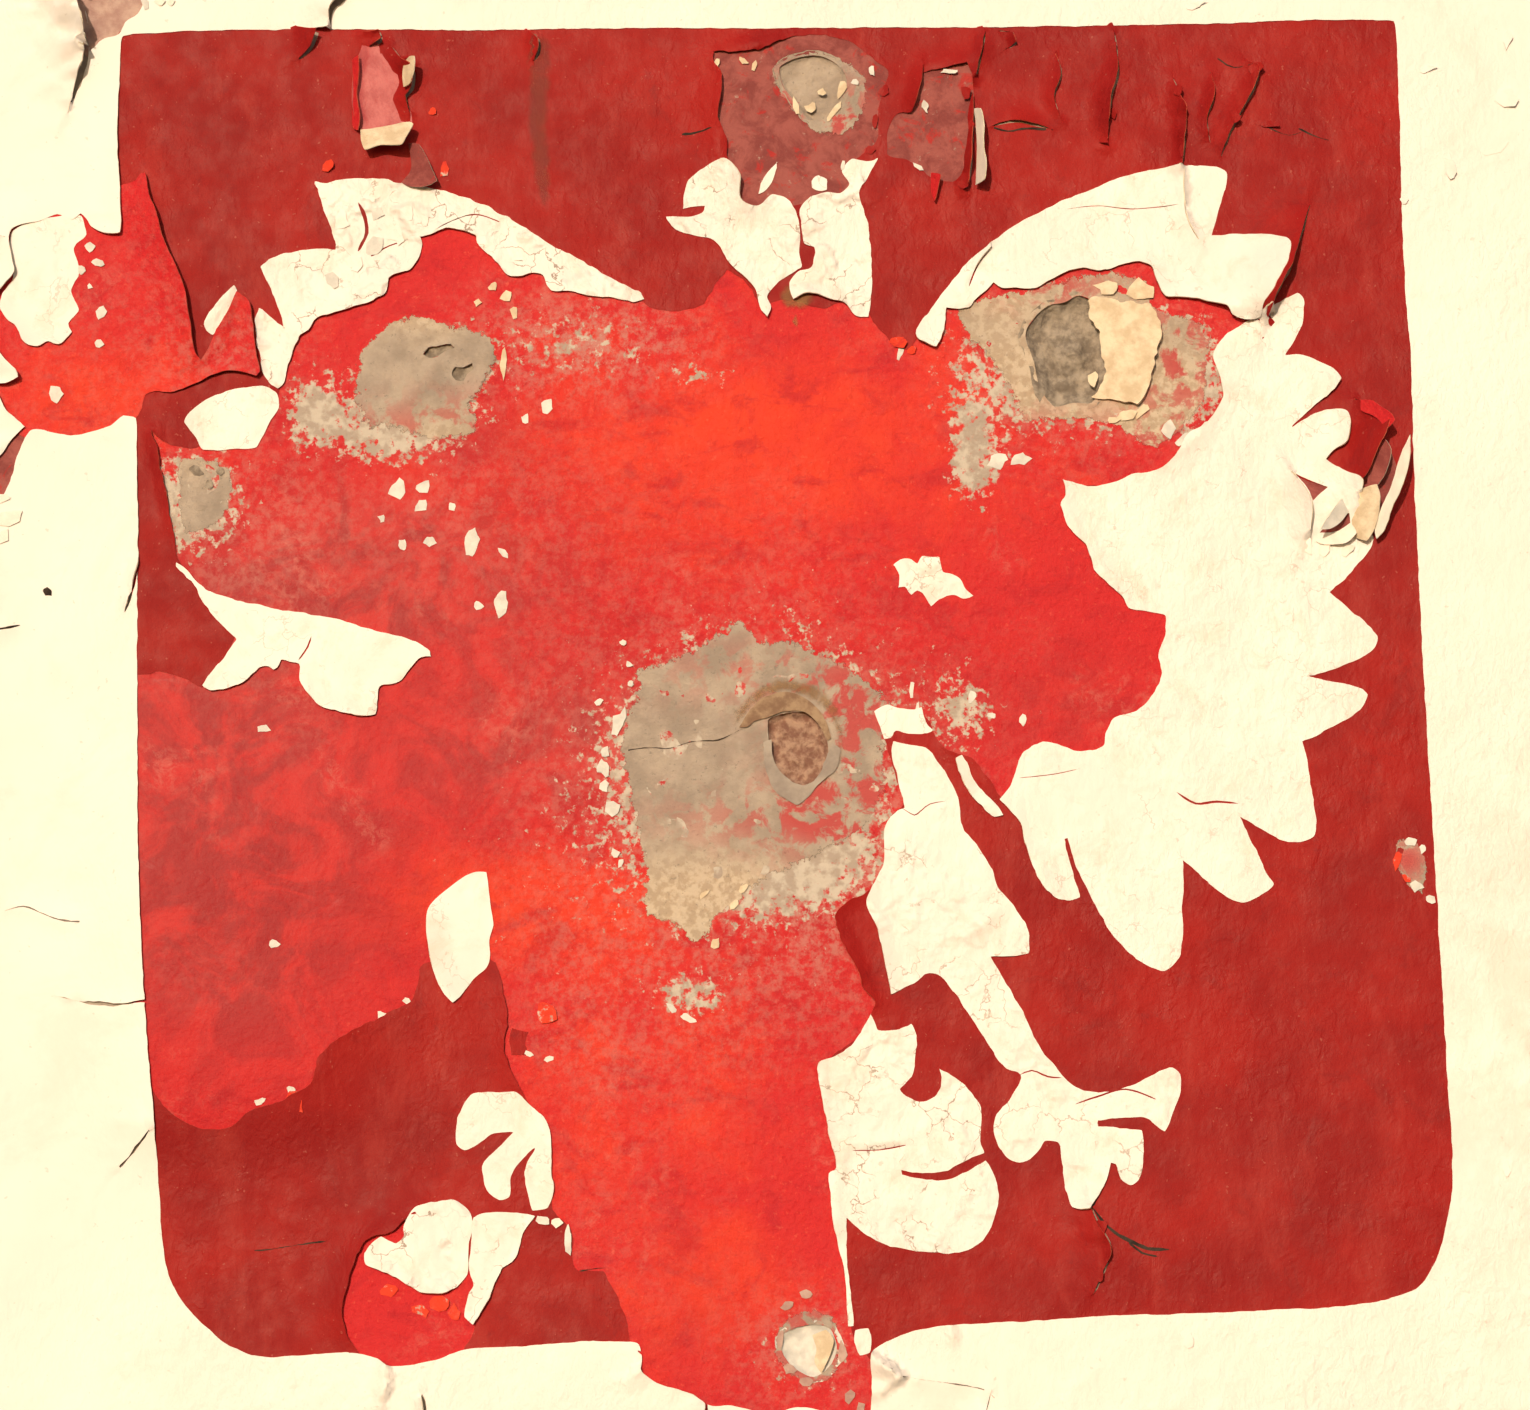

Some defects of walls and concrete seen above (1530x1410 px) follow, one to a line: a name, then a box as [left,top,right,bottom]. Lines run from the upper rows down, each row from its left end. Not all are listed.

peeling [0,0,175,114]
peeling [322,159,334,172]
peeling [352,42,449,187]
peeling [713,35,987,206]
peeling [0,173,260,544]
peeling [1283,398,1411,557]
peeling [132,206,1244,1410]
crack [8,906,80,922]